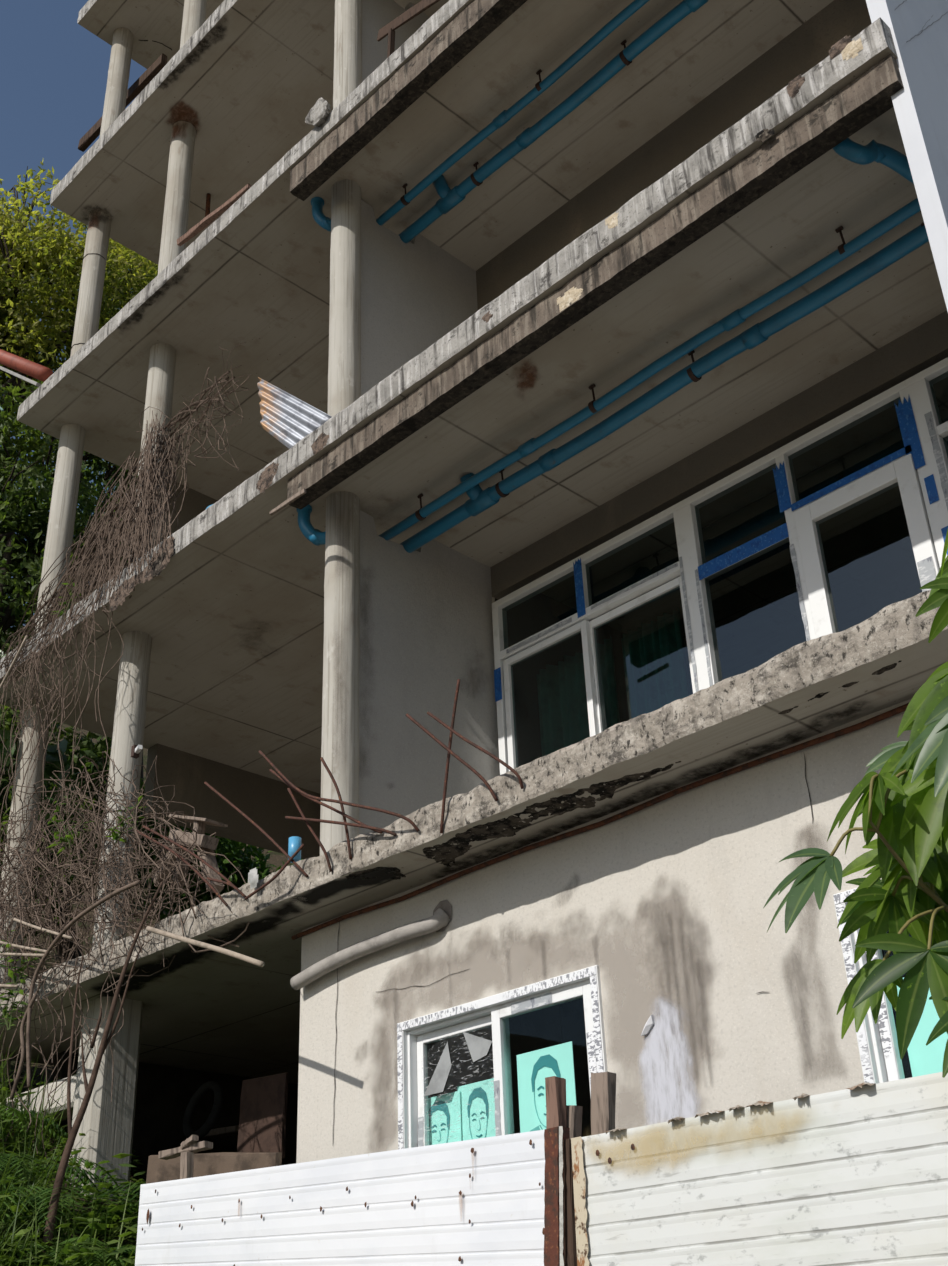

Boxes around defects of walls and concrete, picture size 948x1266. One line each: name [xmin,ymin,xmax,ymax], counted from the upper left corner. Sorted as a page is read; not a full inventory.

rust [168,102,198,138]
spalling [557,287,583,312]
spalling [778,681,859,714]
spalling [872,661,901,675]
spalling [423,761,681,867]
crack [804,754,813,824]
water stain [379,899,707,1112]
rust [529,1127,612,1266]